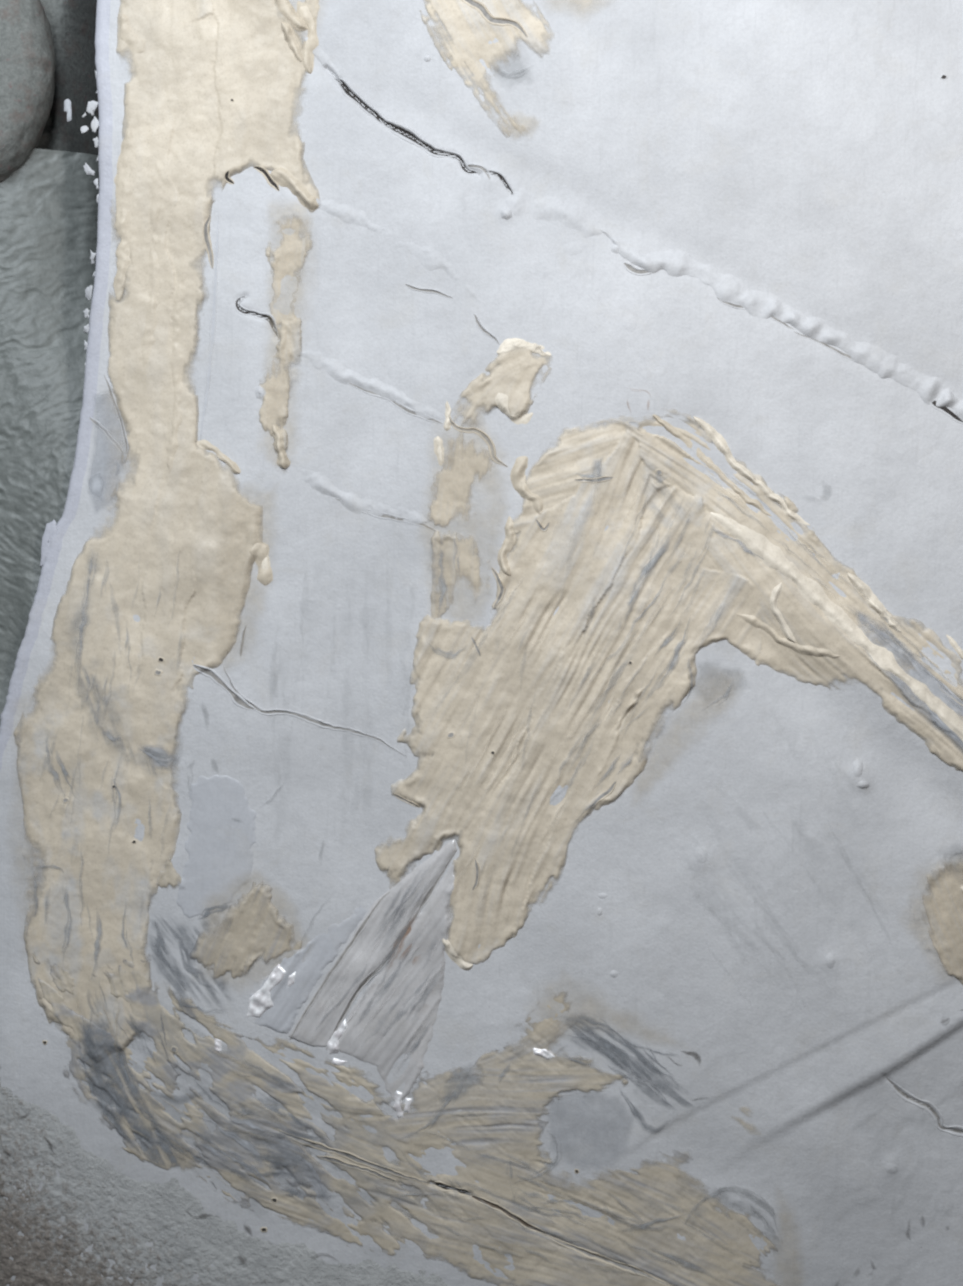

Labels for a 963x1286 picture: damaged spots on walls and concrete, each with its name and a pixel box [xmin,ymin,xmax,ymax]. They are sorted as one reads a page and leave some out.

peeling [64,70,99,204]
crack [329,70,514,195]
peeling [83,249,96,366]
peeling [40,520,58,567]
crack [193,625,407,757]
crack [885,1076,963,1137]
crack [270,1127,671,1286]